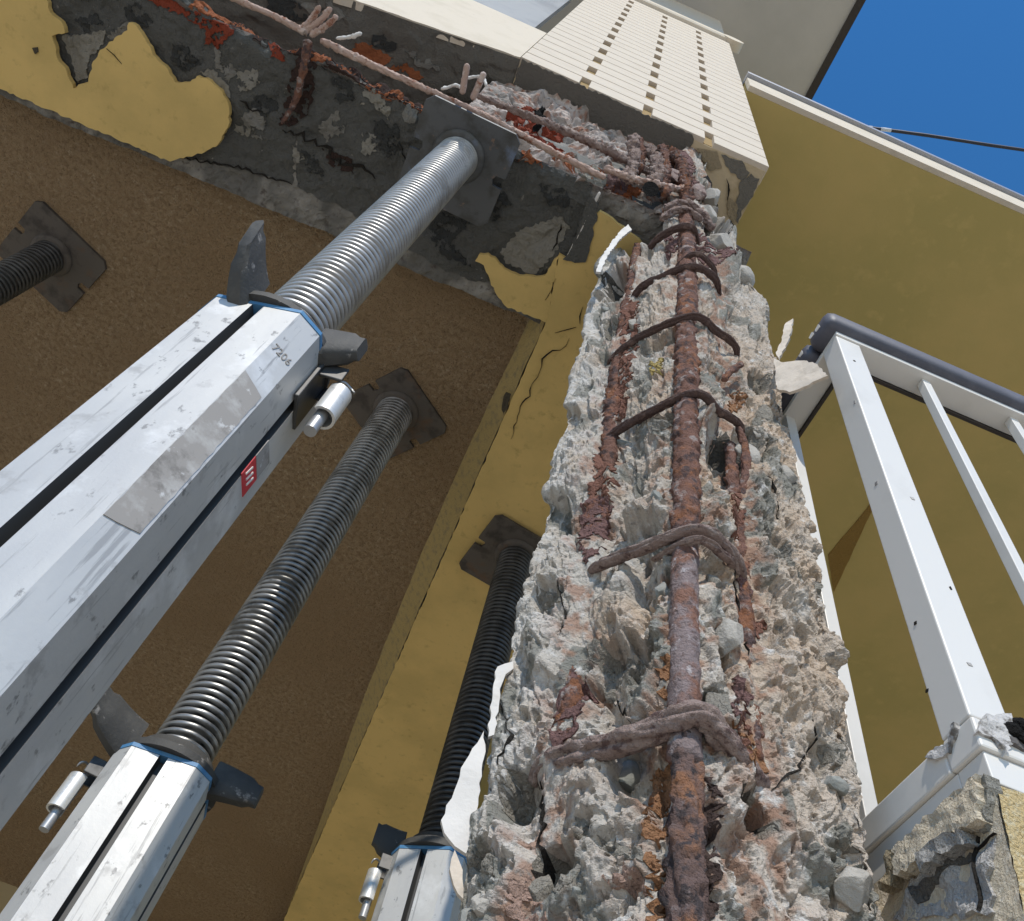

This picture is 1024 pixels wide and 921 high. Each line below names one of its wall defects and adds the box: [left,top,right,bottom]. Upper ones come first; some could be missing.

corrosion [149,0,424,127]
spalling [51,0,778,707]
crack [513,307,583,433]
peeling [747,319,829,395]
corrosion [576,454,621,565]
peeling [440,662,537,902]
corrosion [601,764,672,921]
spalling [657,727,709,921]
corrosion [703,777,728,921]
corrosion [730,674,769,774]
spalling [877,774,1003,921]
crack [971,832,997,912]